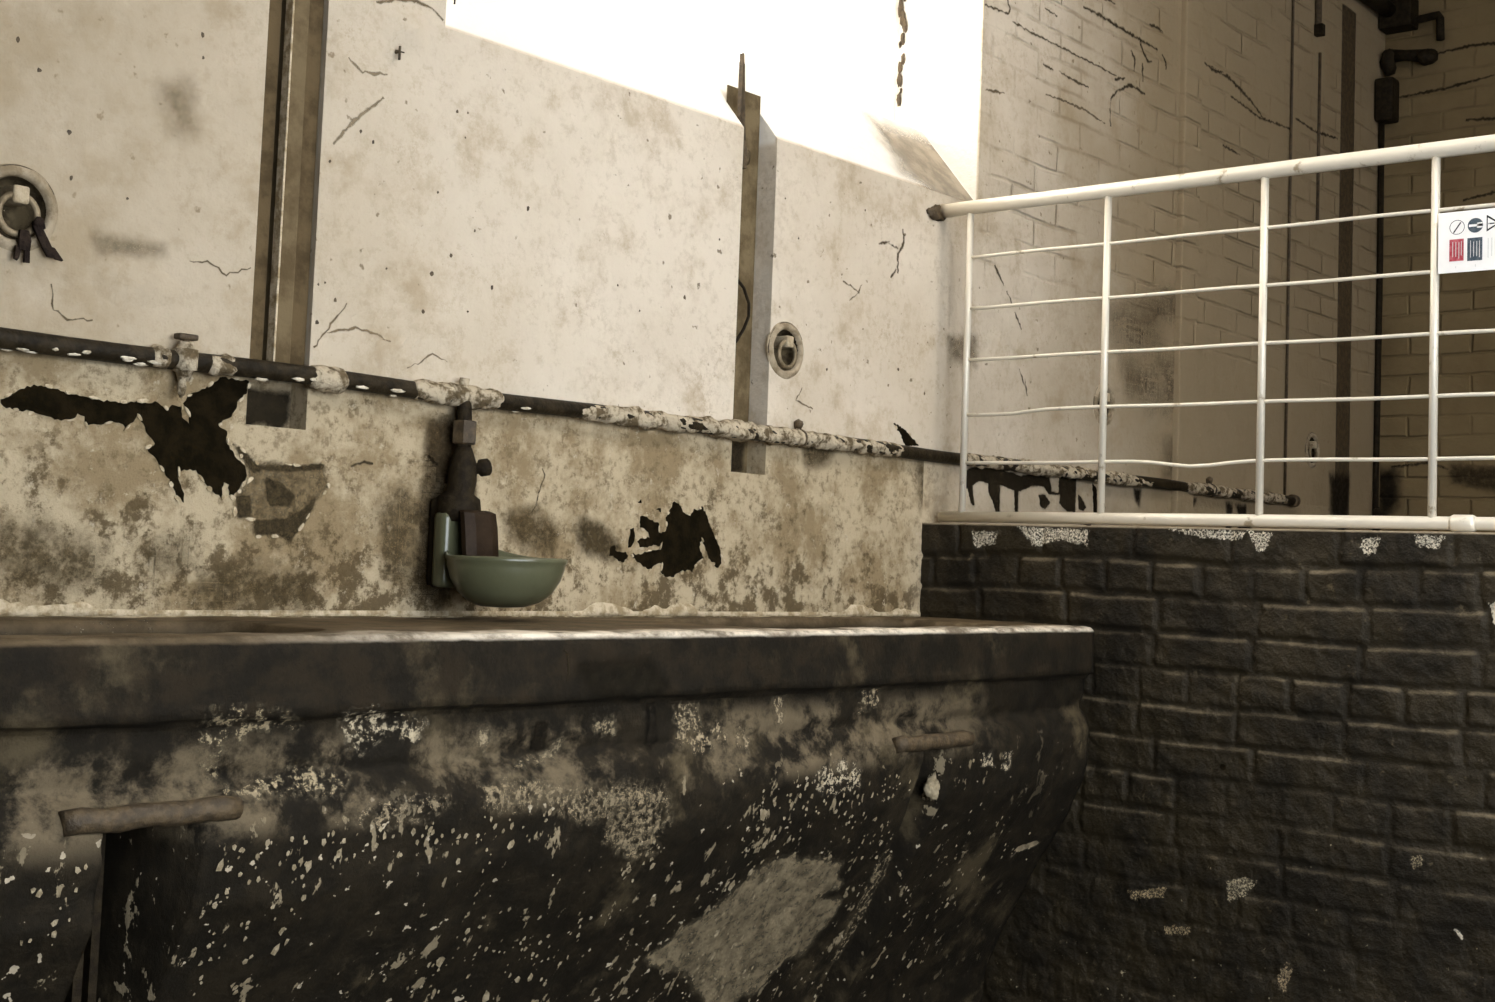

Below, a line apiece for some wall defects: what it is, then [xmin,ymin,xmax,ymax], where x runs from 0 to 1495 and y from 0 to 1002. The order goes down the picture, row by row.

crack [333,58,388,144]
crack [985,0,1167,126]
crack [843,229,905,300]
crack [313,303,444,368]
flaking render [1,377,330,541]
water stain [966,453,1154,526]
water stain [0,526,97,581]
water stain [197,571,312,605]
flaking render [610,500,723,580]
peeling [200,845,261,918]
spalling [647,760,911,1002]
peeling [419,902,583,1002]